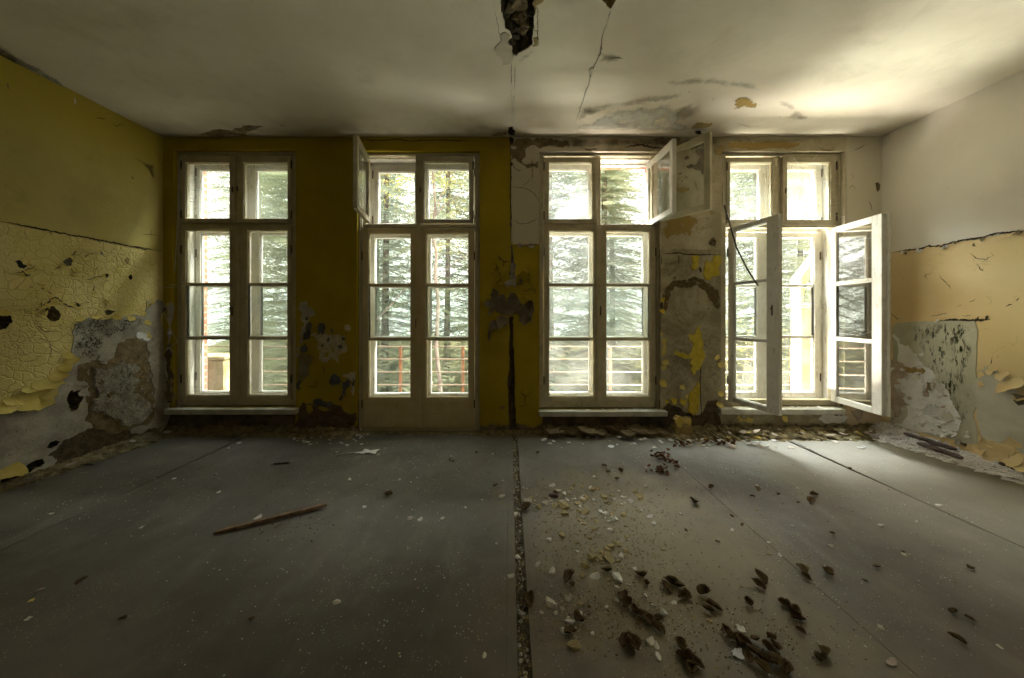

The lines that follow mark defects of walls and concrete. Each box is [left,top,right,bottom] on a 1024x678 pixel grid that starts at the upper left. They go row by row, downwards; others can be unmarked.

peeling [495,32,514,65]
crack [575,14,670,149]
peeling [654,137,725,182]
spalling [15,257,37,278]
peeling [483,263,536,342]
peeling [691,255,722,280]
peeling [0,298,189,482]
peeling [295,301,357,428]
peeling [890,319,1024,472]